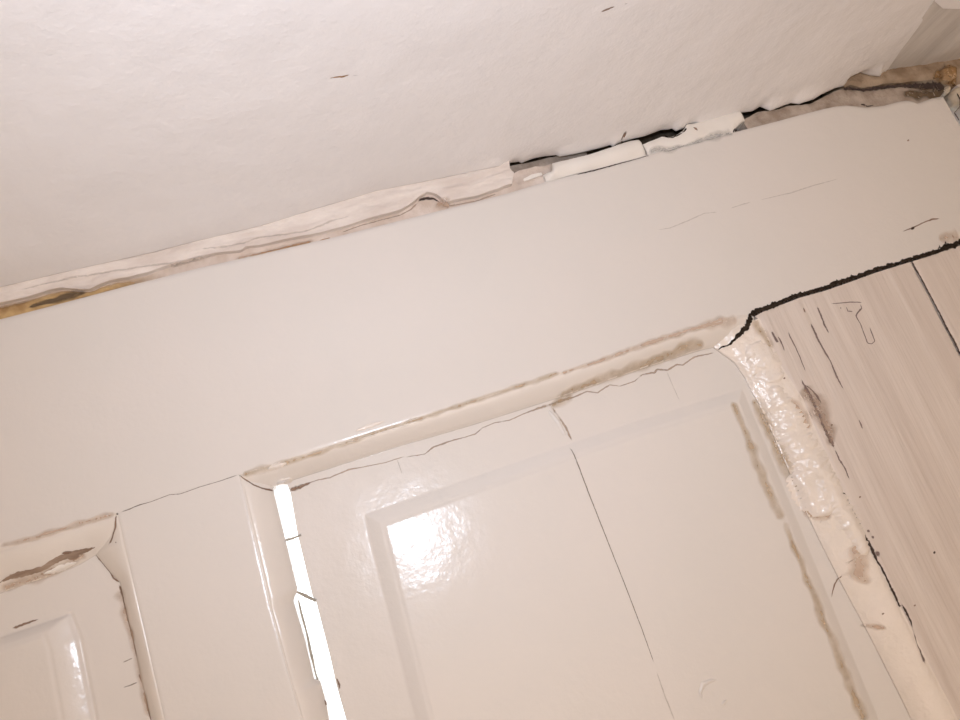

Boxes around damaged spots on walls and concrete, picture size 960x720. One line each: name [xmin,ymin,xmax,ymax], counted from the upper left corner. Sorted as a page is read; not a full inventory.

flaking render [737,59,960,131]
flaking render [510,152,587,190]
crack [718,239,960,388]
peeling [0,547,95,583]
crack [98,476,273,719]
crack [547,409,653,659]
crack [843,493,925,662]